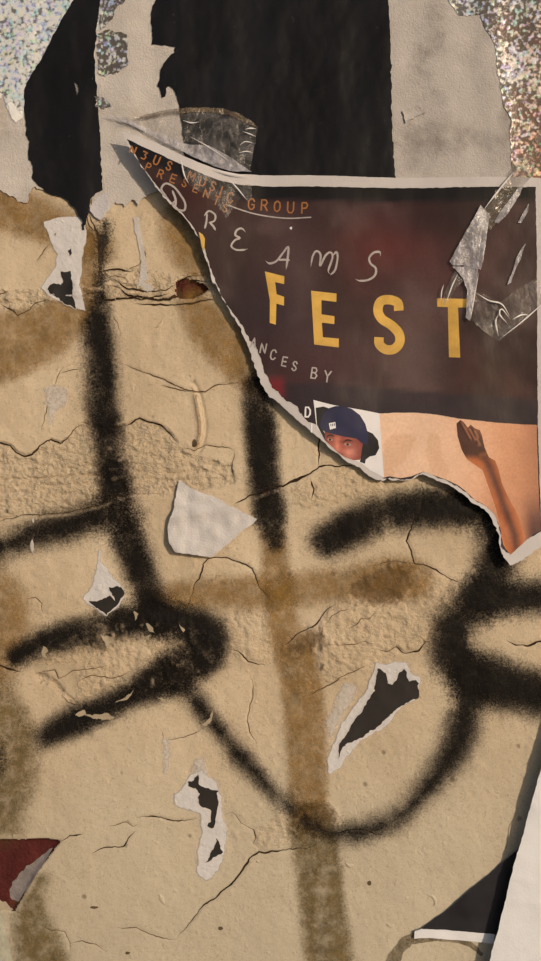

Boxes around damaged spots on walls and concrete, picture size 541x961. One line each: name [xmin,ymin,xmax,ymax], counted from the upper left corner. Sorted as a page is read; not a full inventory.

spalling [0,288,62,314]
spalling [79,267,222,302]
crack [0,364,85,457]
crack [375,509,462,584]
crack [174,557,274,607]
crack [62,815,192,854]
crack [118,812,317,940]